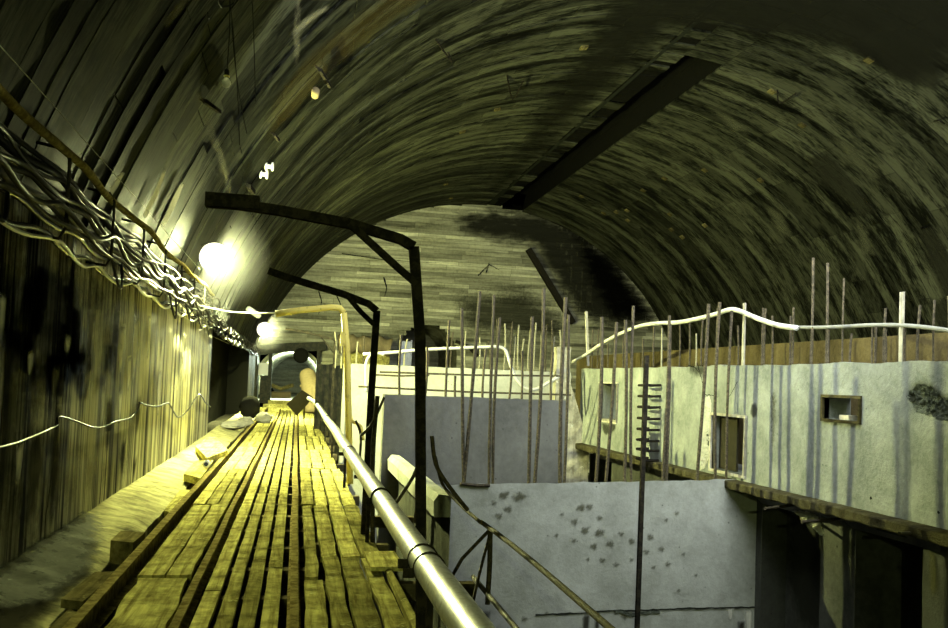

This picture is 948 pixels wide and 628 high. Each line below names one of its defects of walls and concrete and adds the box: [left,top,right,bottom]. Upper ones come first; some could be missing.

spalling [761,308,774,365]
spalling [903,296,948,361]
spalling [906,384,948,421]